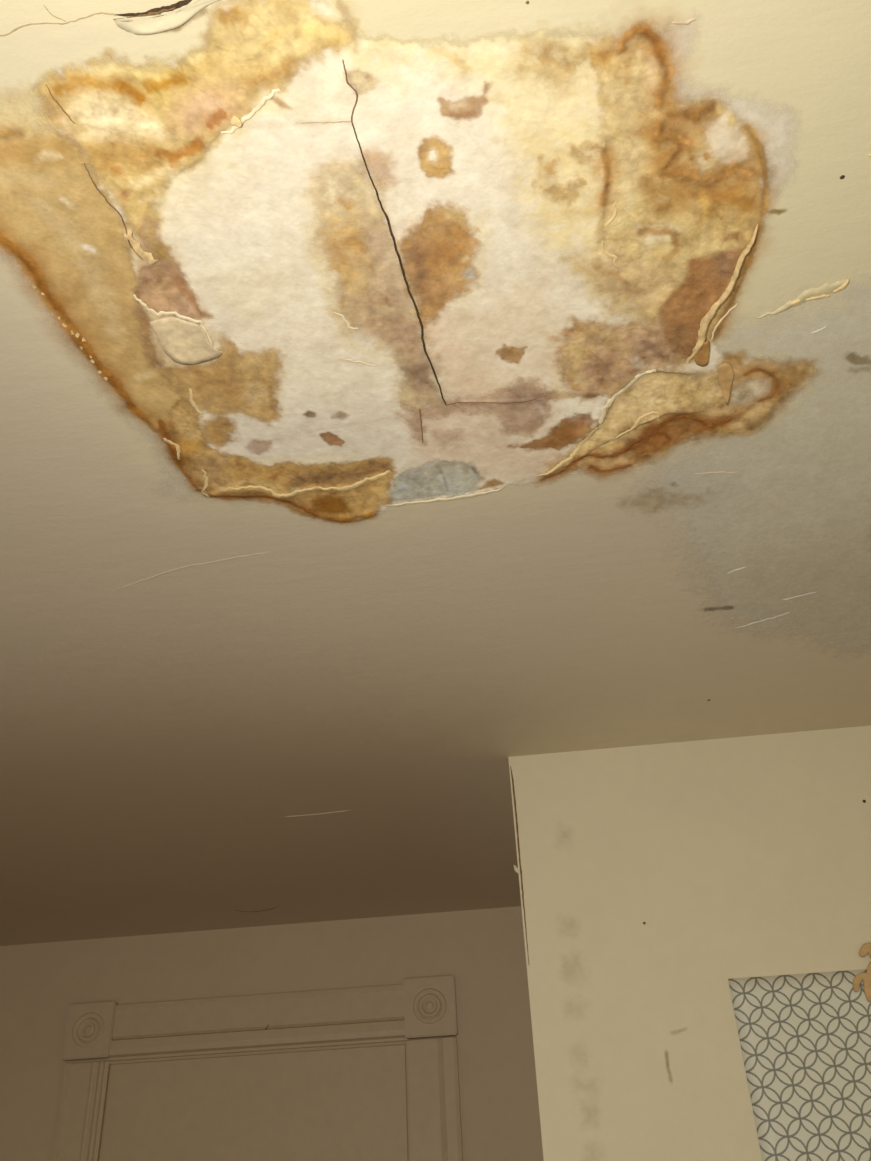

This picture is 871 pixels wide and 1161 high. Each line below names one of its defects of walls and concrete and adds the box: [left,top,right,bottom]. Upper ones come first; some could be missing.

crack [0,0,219,36]
damp [0,0,396,523]
peeling [36,0,761,519]
crack [301,60,545,443]
damp [315,22,816,481]
damp [847,353,871,364]